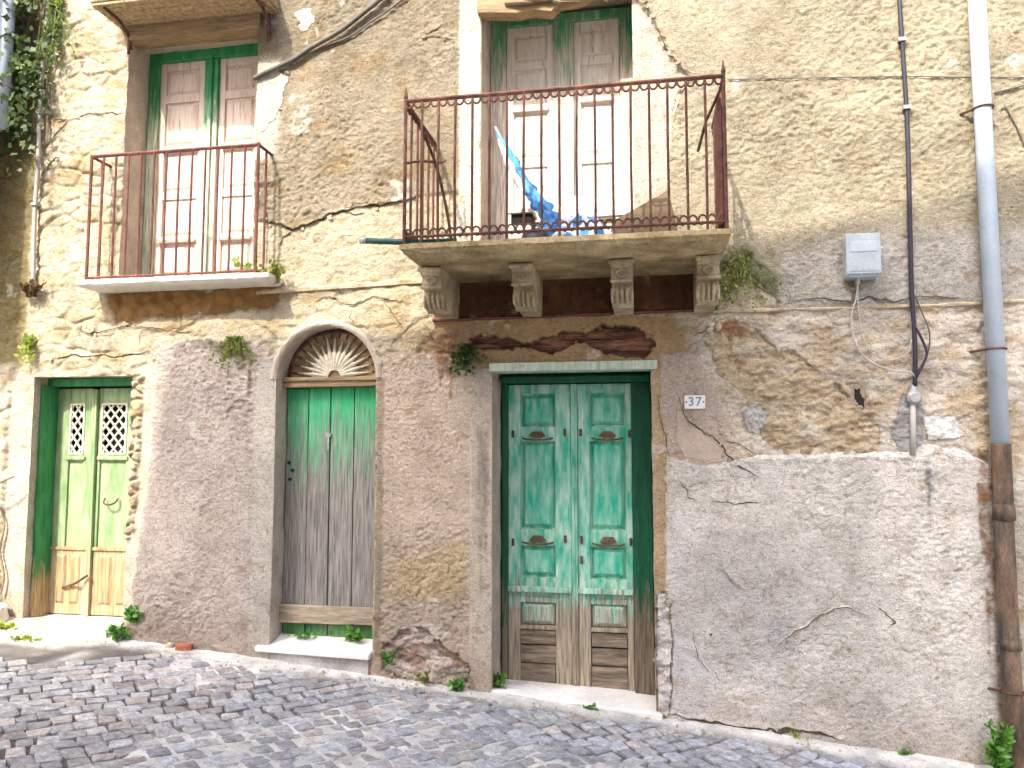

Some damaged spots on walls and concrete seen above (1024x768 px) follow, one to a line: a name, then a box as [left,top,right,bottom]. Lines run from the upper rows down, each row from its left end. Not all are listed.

crack [258,193,416,246]
spalling [671,316,984,466]
crack [654,390,761,505]
crack [775,605,899,647]
spalling [378,627,473,685]